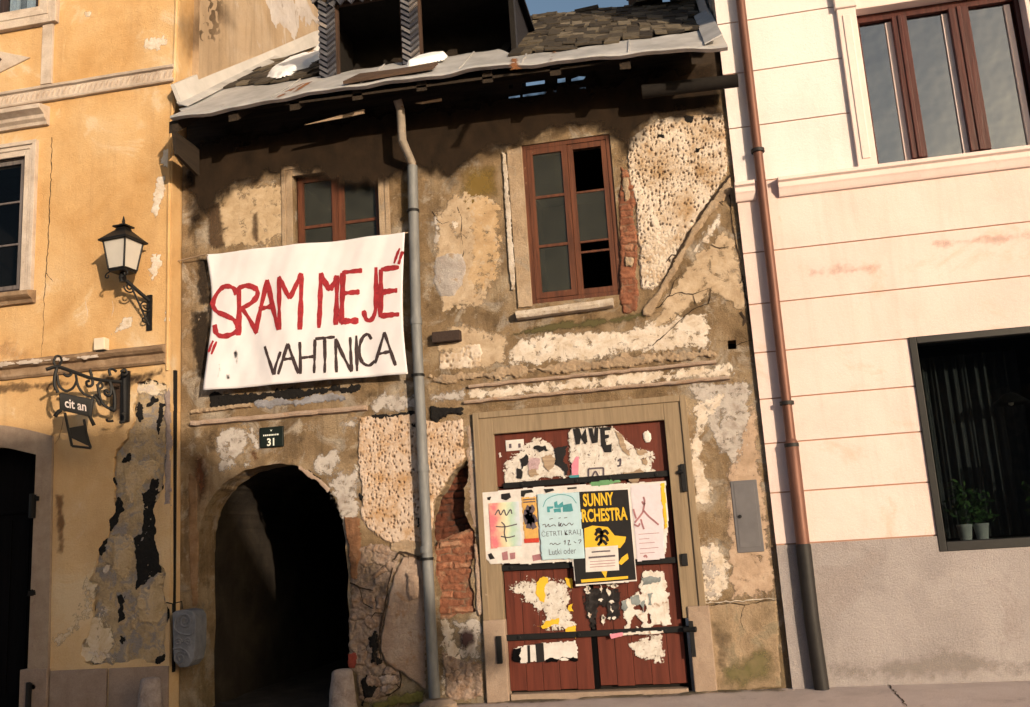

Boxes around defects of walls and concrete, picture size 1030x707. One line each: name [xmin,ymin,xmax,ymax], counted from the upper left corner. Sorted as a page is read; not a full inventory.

flaking render [266,0,319,40]
peeling [151,149,172,216]
crack [41,137,53,356]
flaking render [81,380,173,665]
peeling [244,425,262,468]
peeling [299,449,340,493]
flaking render [434,442,475,542]
peeling [689,392,726,505]
peeling [700,543,733,601]